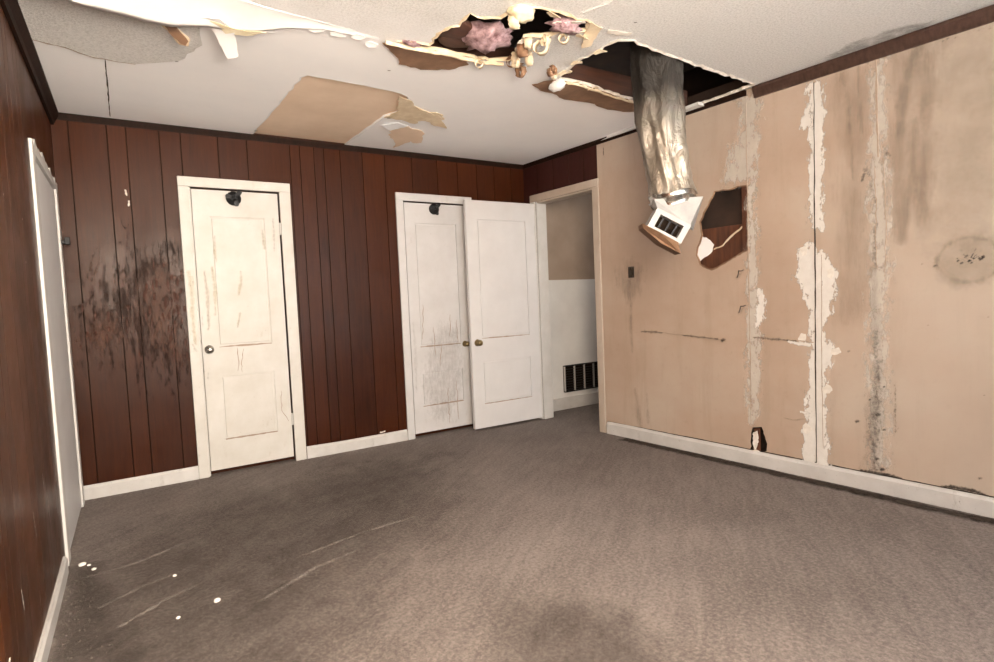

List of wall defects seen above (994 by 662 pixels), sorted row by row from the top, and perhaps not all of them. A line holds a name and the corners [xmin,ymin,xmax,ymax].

peeling [69,0,379,59]
peeling [547,11,589,40]
peeling [558,61,599,90]
peeling [381,96,447,148]
spalling [696,185,748,271]